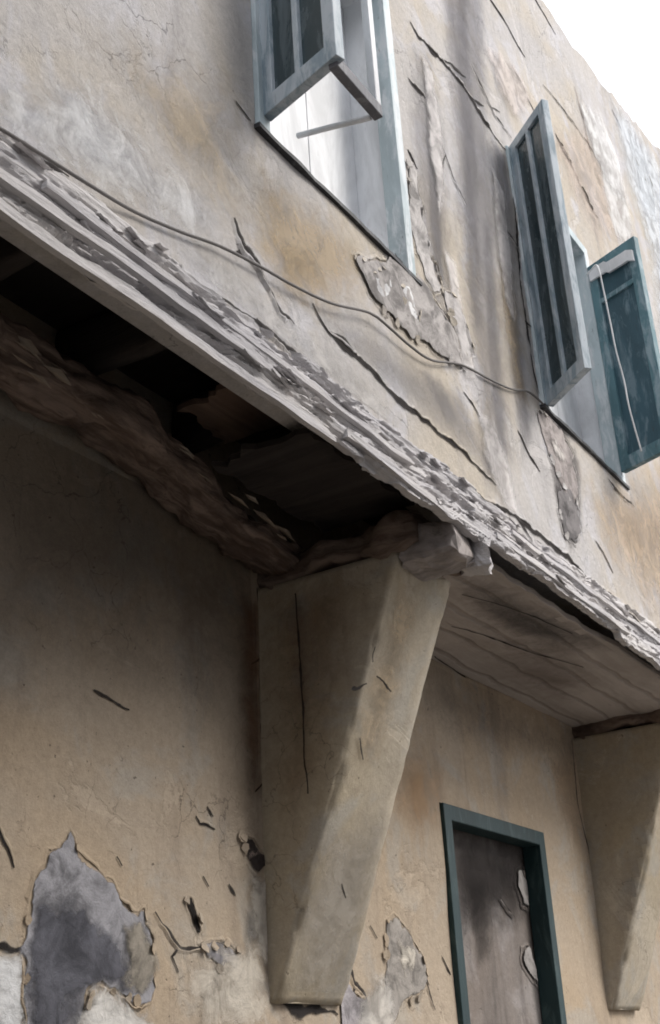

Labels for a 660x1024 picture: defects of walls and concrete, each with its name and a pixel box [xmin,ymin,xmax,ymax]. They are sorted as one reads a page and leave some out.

peeling [424,62,443,205]
crack [409,21,511,150]
peeling [582,106,660,278]
spalling [350,159,476,377]
peeling [244,349,391,441]
crack [211,197,613,594]
spalling [534,408,581,548]
crack [295,593,309,794]
spalling [16,826,159,1024]
crack [153,911,241,973]
spalling [382,911,429,1024]
leakage [453,831,526,925]